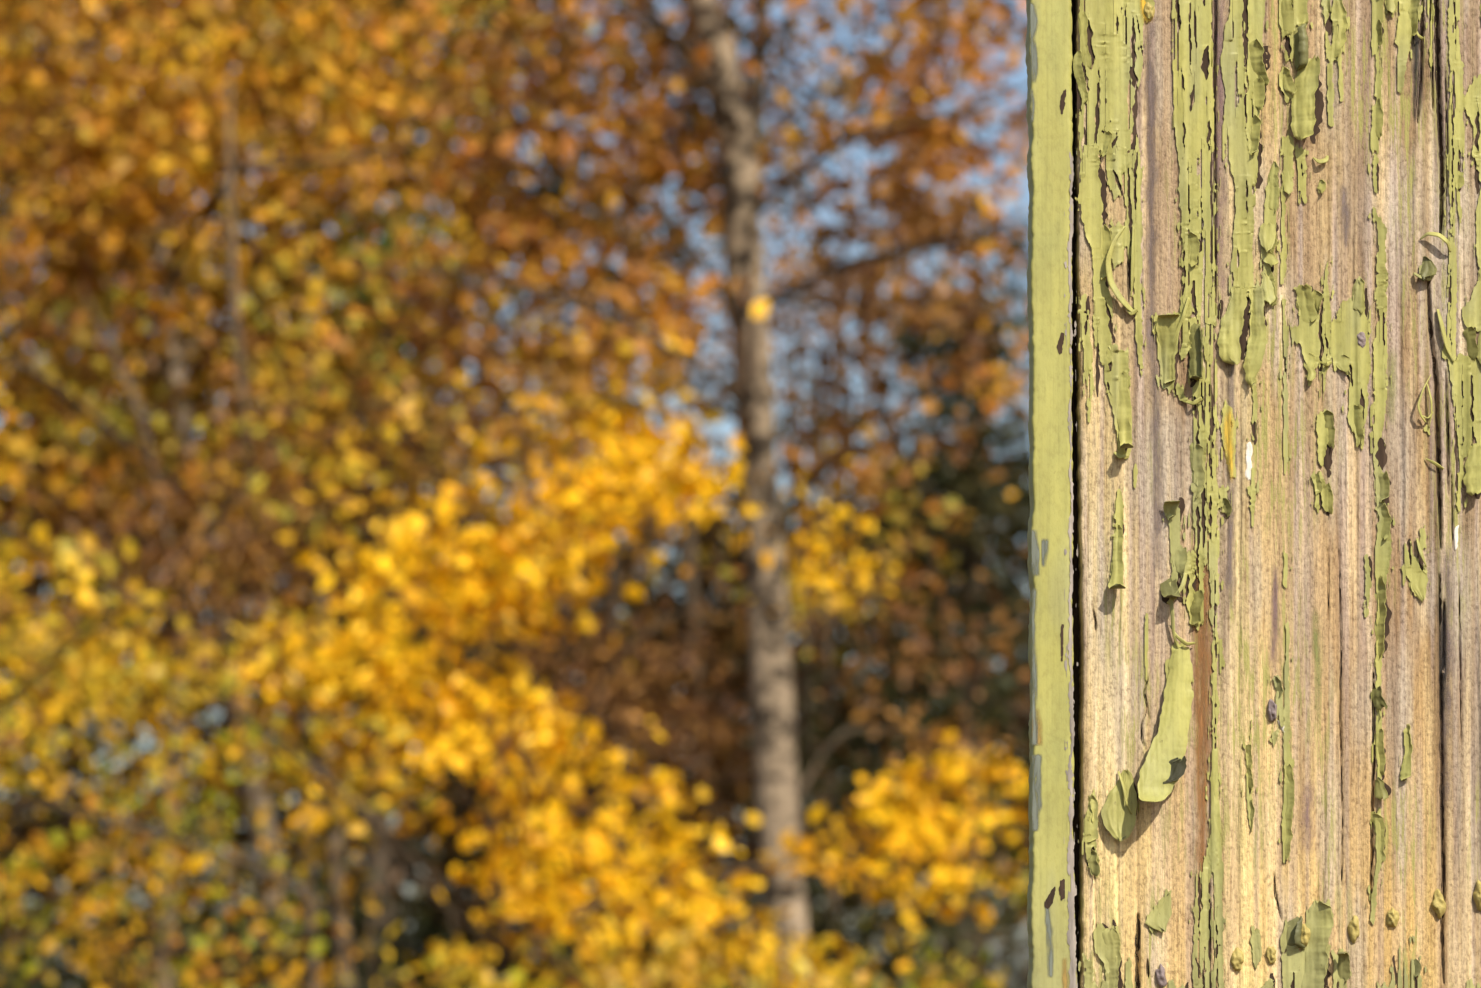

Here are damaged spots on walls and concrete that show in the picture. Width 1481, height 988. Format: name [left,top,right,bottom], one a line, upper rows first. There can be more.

peeling [1030,4,1038,121]
peeling [1032,0,1481,988]